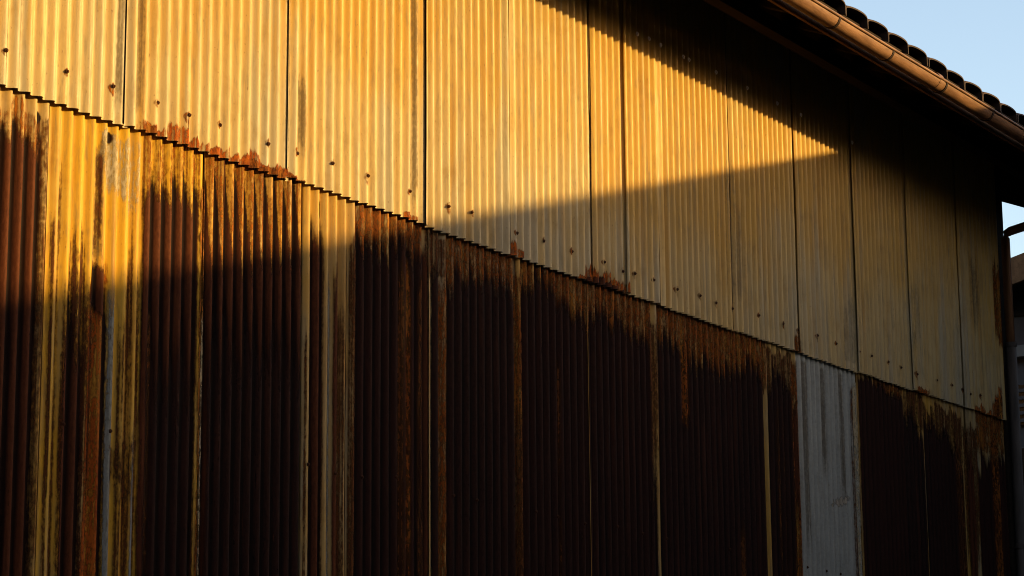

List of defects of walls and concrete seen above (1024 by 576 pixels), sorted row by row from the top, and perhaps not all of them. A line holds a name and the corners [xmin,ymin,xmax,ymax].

rust [0,95,803,576]
rust [850,371,1011,576]